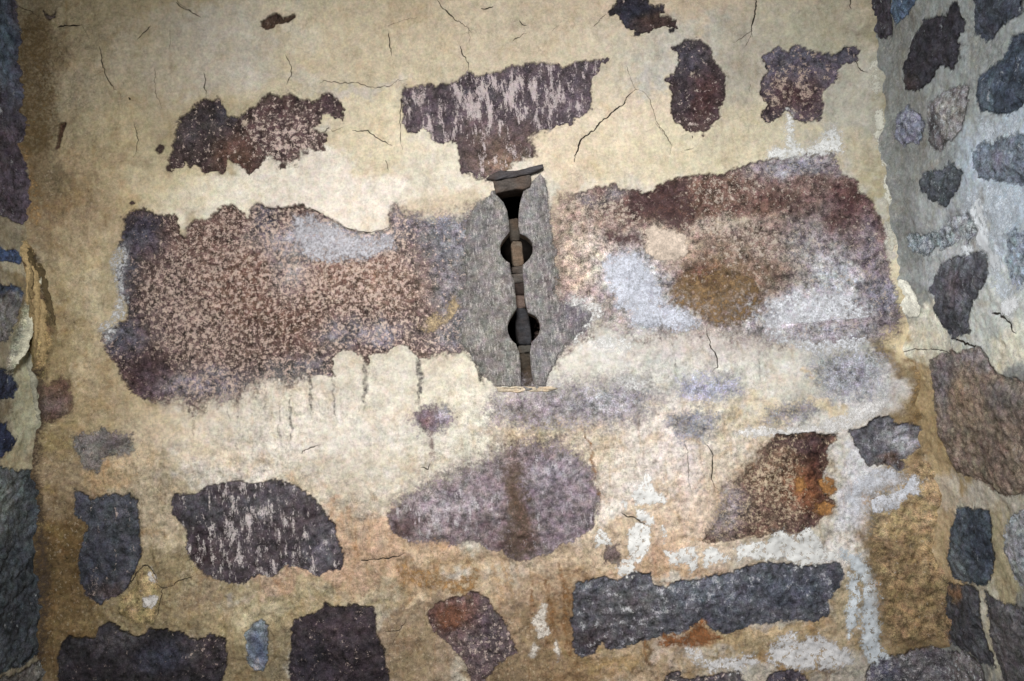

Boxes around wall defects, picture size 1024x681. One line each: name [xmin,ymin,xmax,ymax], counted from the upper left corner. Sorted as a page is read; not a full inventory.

spalling [155,92,346,175]
crack [321,79,407,168]
spalling [401,57,609,181]
crack [574,68,693,162]
spalling [550,39,921,402]
spalling [100,201,472,417]
spalling [74,489,142,605]
spalling [171,478,344,585]
spalling [387,371,953,681]
rust [814,477,837,515]
spalling [57,622,228,681]
spalling [288,602,389,681]